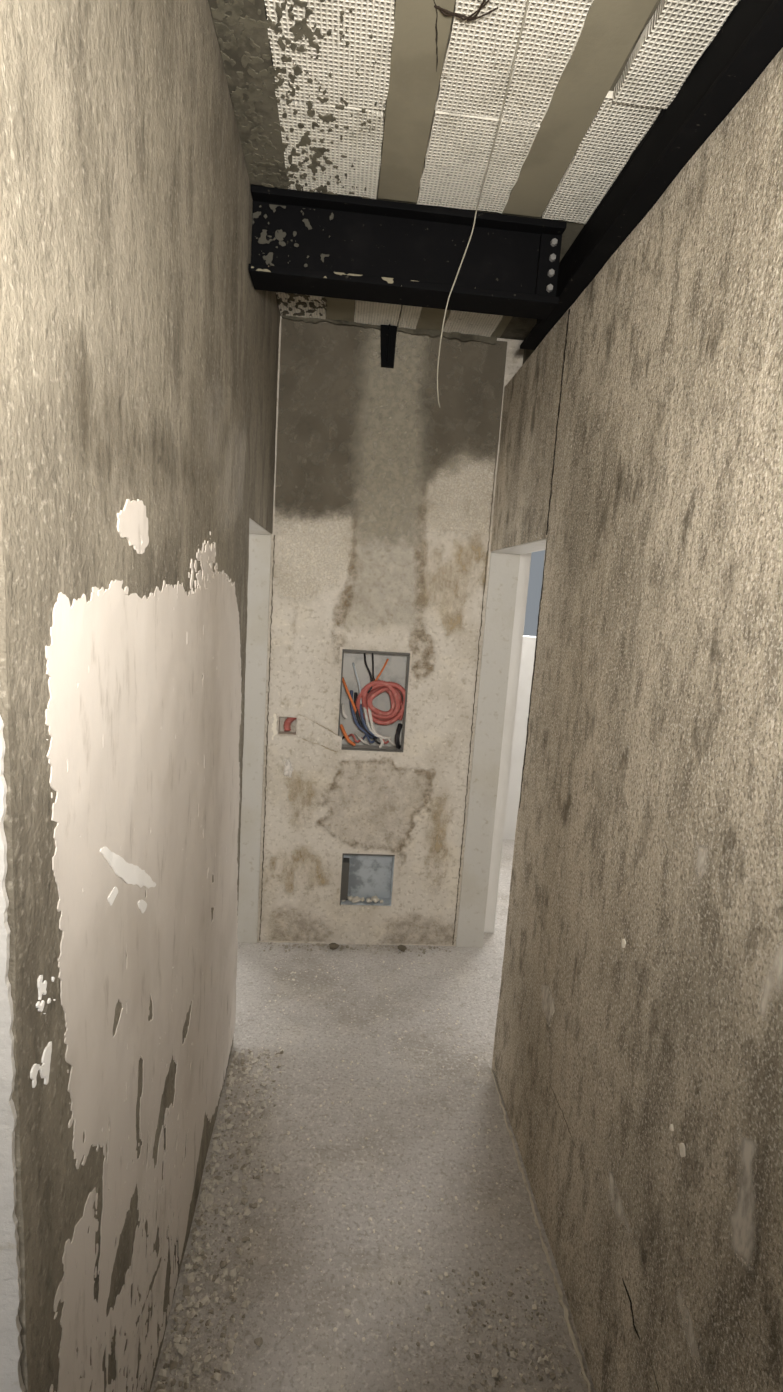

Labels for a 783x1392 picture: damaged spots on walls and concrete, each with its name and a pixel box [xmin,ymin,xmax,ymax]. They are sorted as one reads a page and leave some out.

peeling [117,499,149,554]
water stain [275,292,507,625]
water stain [412,642,433,678]
peeling [30,531,242,1392]